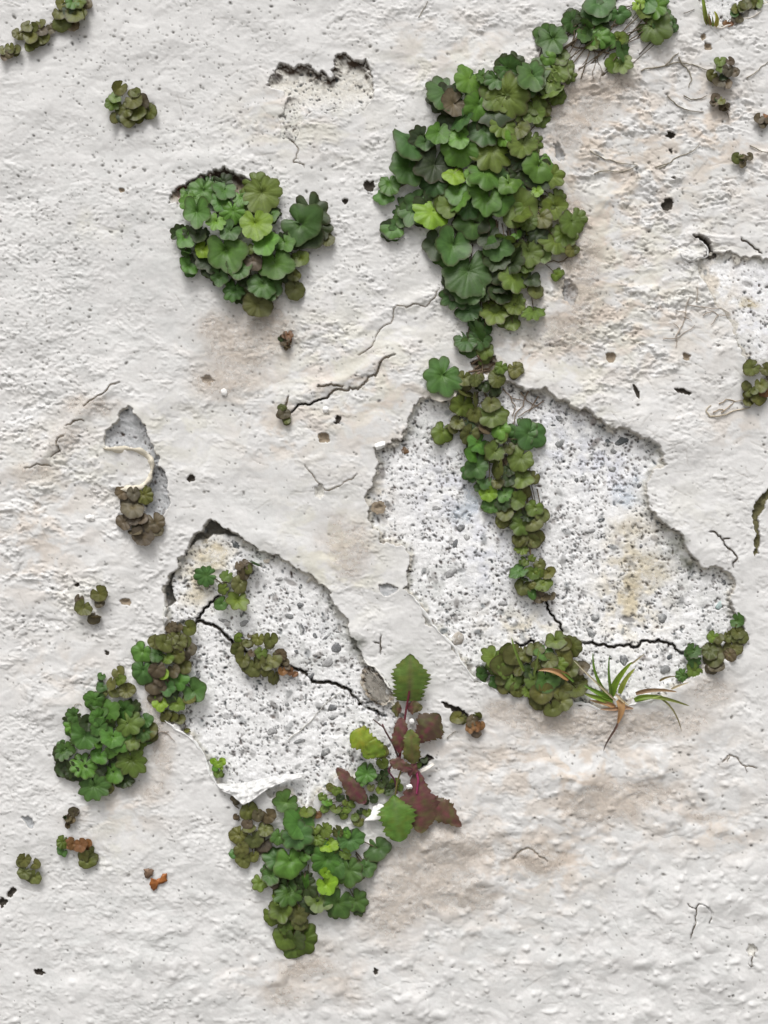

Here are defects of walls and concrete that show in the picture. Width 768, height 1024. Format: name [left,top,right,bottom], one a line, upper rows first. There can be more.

flaking render [269,54,374,142]
crack [285,289,439,412]
flaking render [680,236,768,367]
flaking render [103,406,170,518]
flaking render [365,356,743,710]
crack [196,596,247,653]
flaking render [159,520,414,807]
crack [279,665,384,716]
crack [545,601,684,653]
flaking render [364,804,384,821]